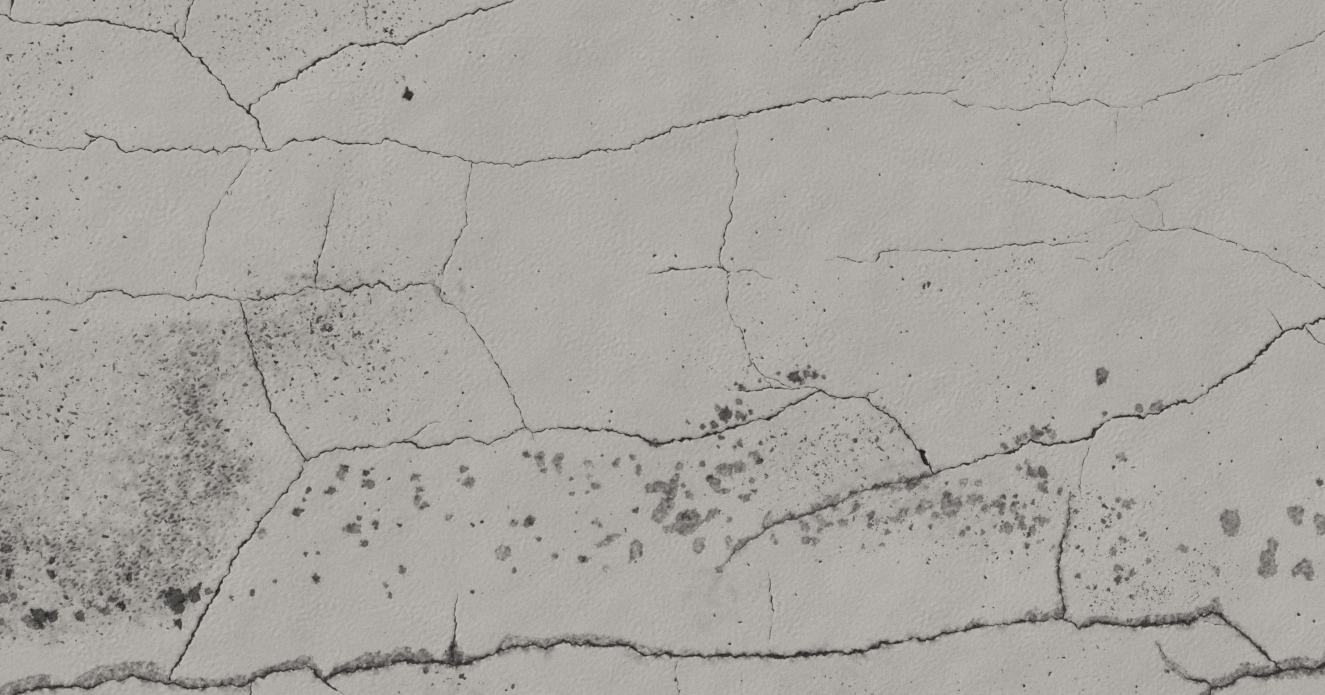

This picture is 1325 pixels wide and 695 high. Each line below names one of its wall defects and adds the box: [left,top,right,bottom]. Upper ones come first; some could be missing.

crack [0,0,1118,320]
crack [0,161,1325,695]